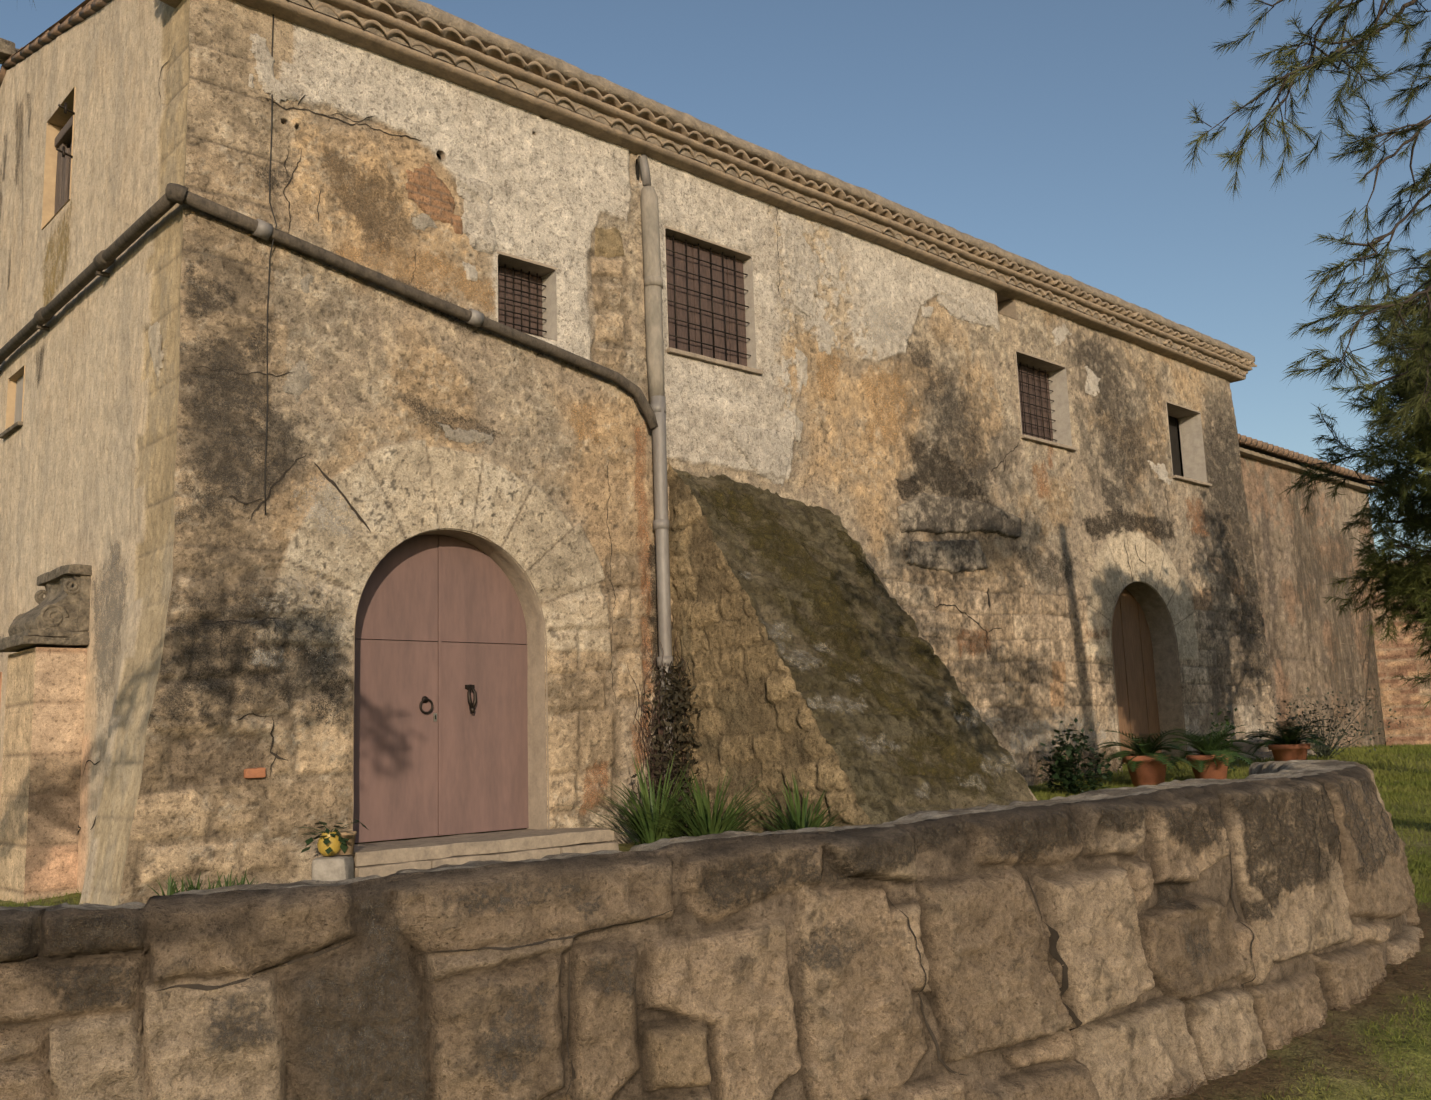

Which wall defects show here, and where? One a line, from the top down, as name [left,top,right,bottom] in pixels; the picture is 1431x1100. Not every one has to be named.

crack [256,95,422,142]
crack [283,150,321,233]
peeling [778,212,841,387]
crack [191,366,292,377]